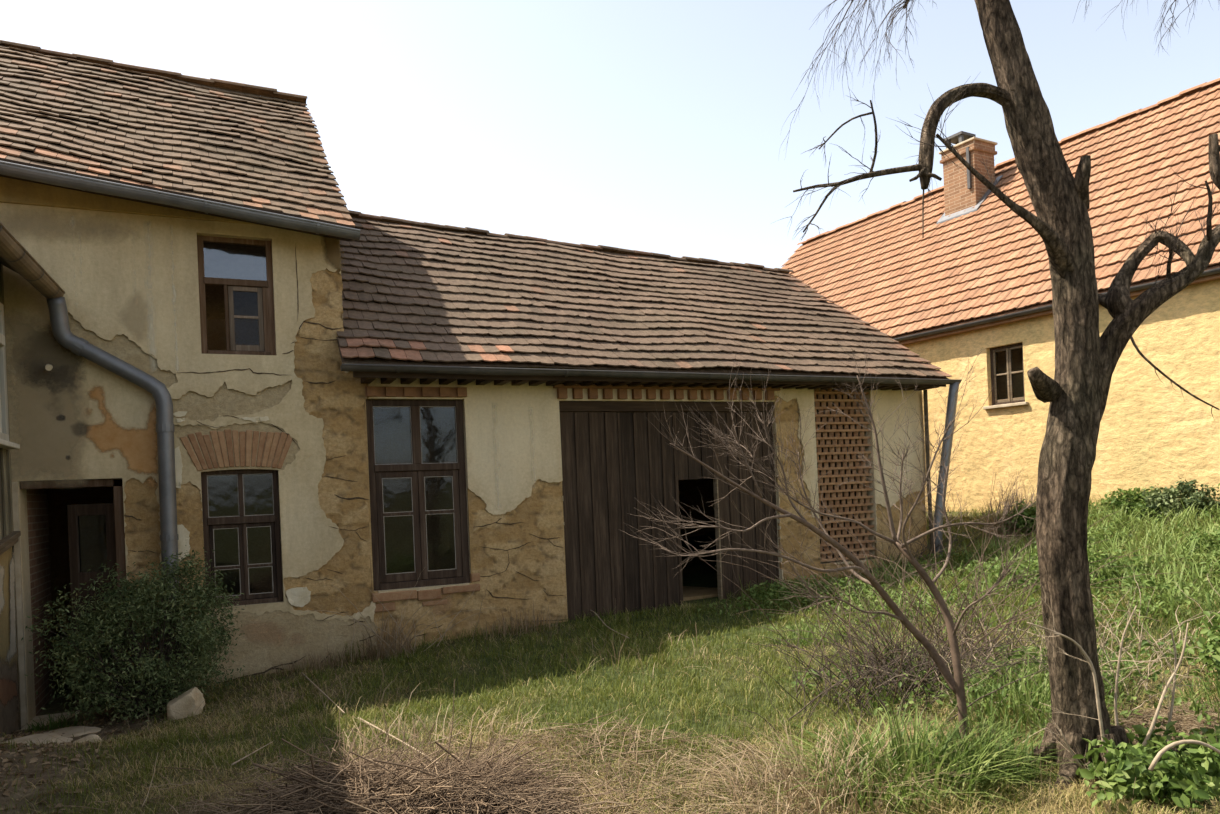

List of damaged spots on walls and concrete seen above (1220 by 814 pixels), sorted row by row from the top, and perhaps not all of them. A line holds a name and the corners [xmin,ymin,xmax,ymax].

spalling [68,269,568,688]
spalling [774,396,928,589]